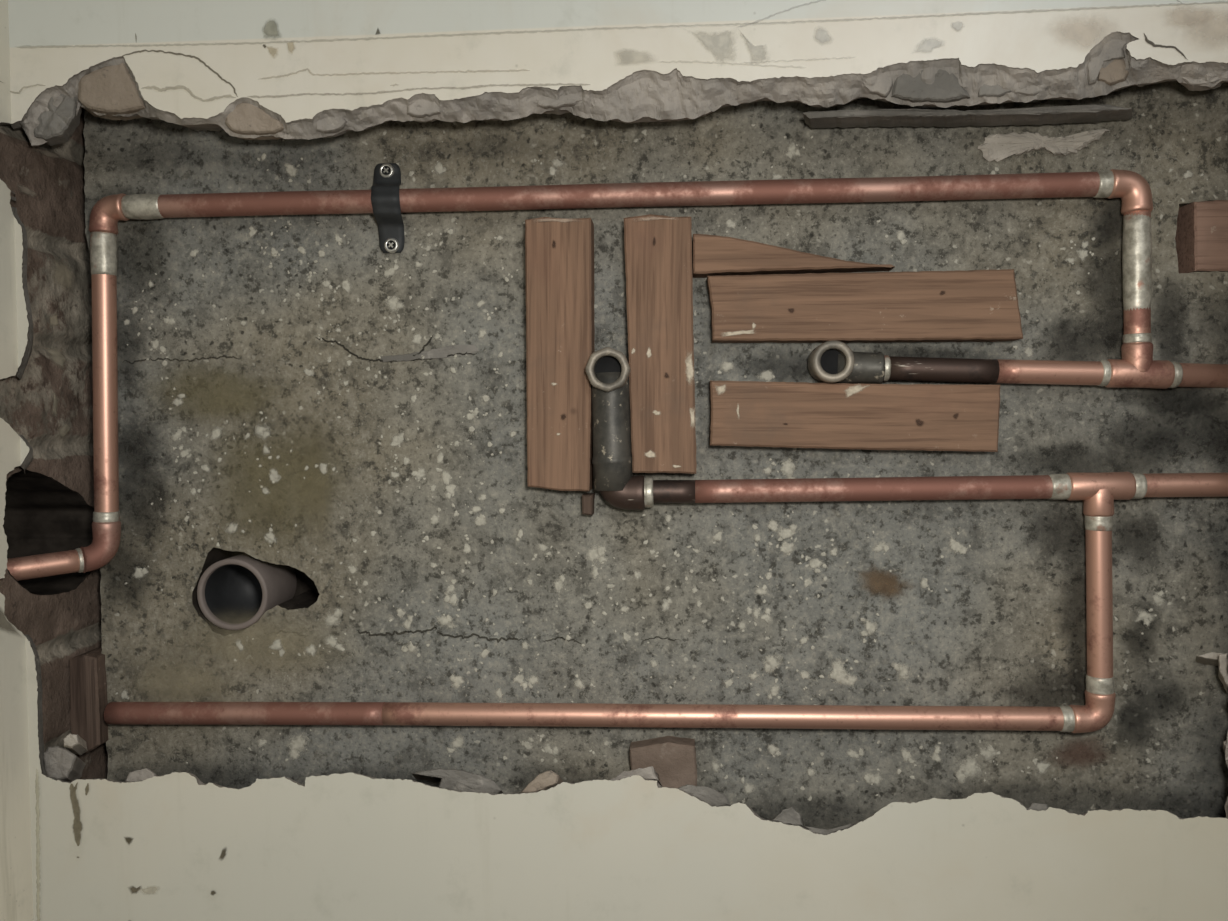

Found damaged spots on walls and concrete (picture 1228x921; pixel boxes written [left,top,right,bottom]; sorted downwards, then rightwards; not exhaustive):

crack [123,49,238,101]
spalling [0,31,1228,147]
spalling [11,191,33,380]
crack [316,334,477,363]
spalling [19,435,33,473]
spalling [1196,652,1228,693]
spalling [0,610,242,789]
spalling [318,766,887,835]
spalling [907,792,1228,820]